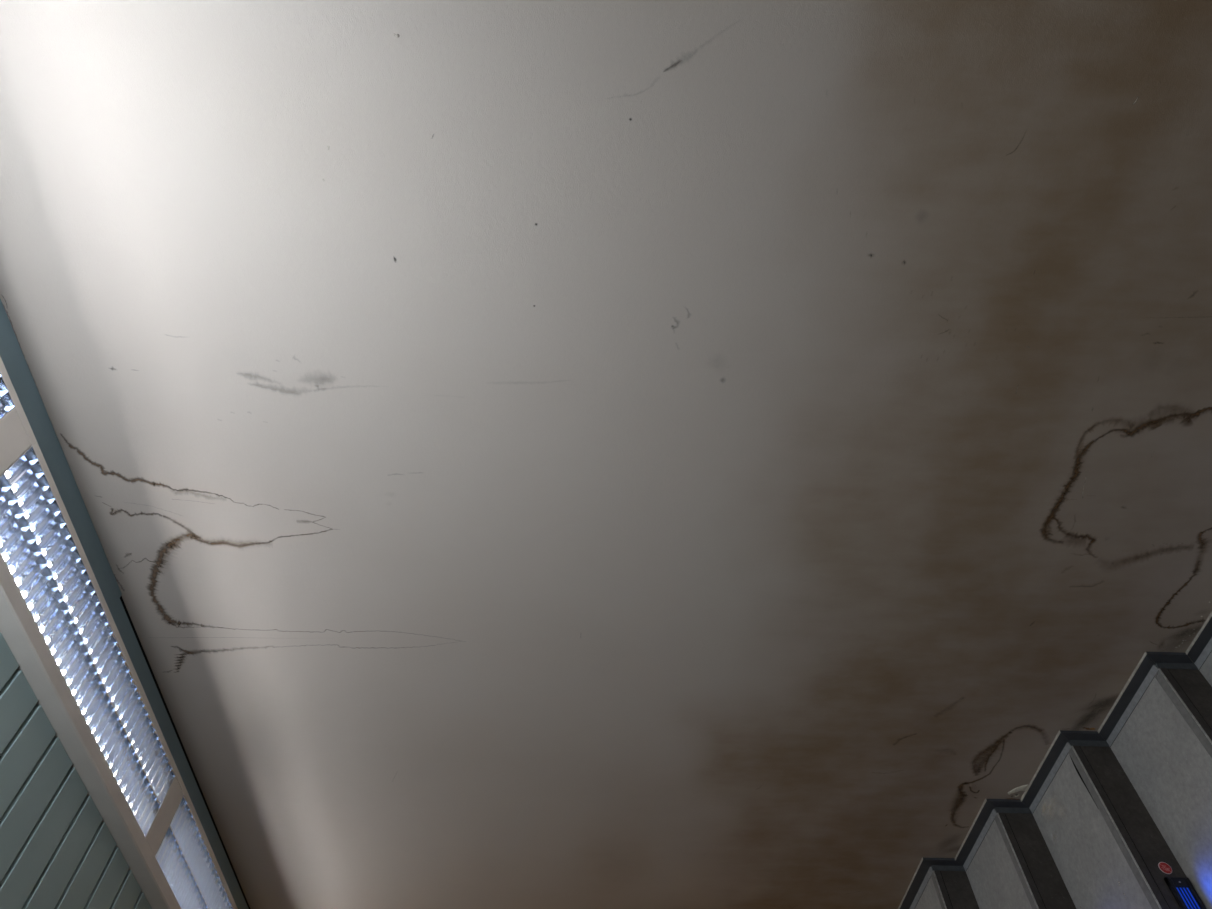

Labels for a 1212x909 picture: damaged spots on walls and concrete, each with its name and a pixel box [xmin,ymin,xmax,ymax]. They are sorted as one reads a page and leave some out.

damp [1041,407,1212,551]
damp [1156,528,1212,629]
crack [1070,756,1098,808]